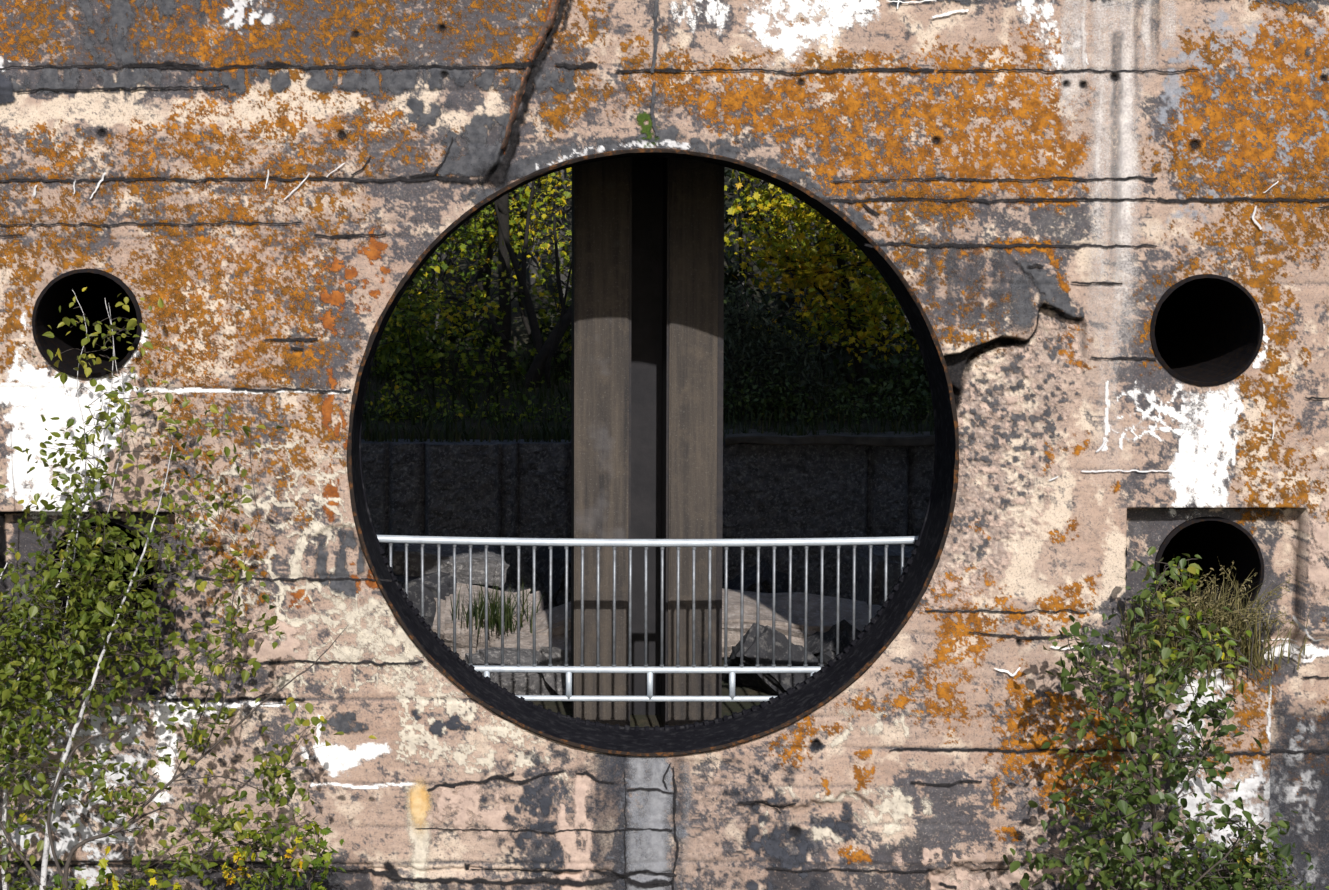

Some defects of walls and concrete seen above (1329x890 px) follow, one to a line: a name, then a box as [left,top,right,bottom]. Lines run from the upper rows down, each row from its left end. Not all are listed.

leakage [671,0,906,66]
crack [0,0,1200,239]
rust [316,228,391,337]
leakage [1017,0,1244,518]
leakage [0,297,352,519]
crack [231,386,351,394]
spalling [916,260,1088,611]
rust [289,584,311,609]
rust [350,562,378,594]
crack [1258,616,1329,679]
peeling [809,710,919,752]
spalling [760,786,1071,890]